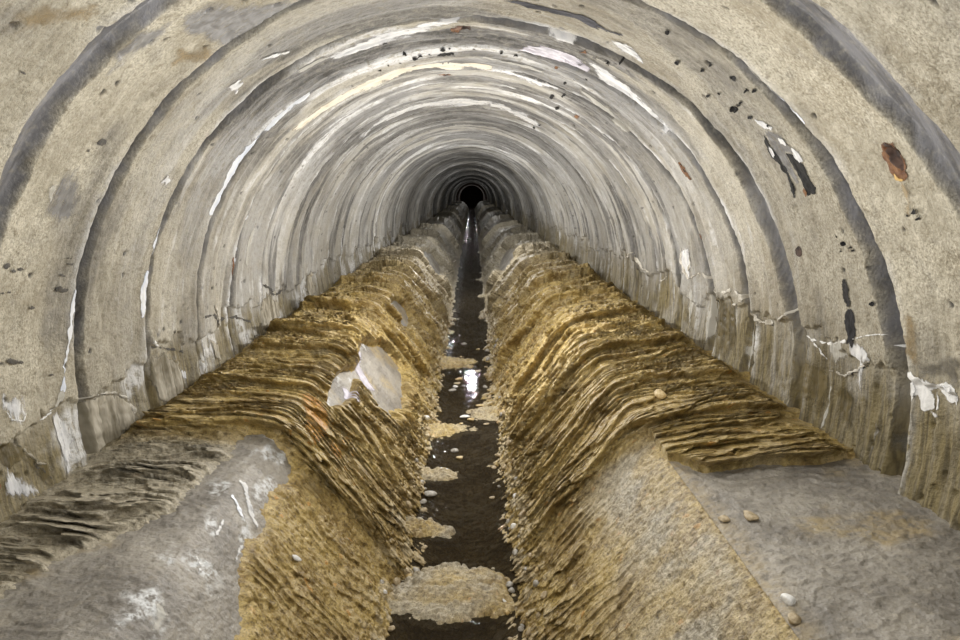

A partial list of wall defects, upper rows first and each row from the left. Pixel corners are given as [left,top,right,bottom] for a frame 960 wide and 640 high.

water stain [209,92,310,215]
spalling [747,116,816,198]
rust [881,142,909,214]
crack [807,334,906,359]
water stain [0,200,855,640]